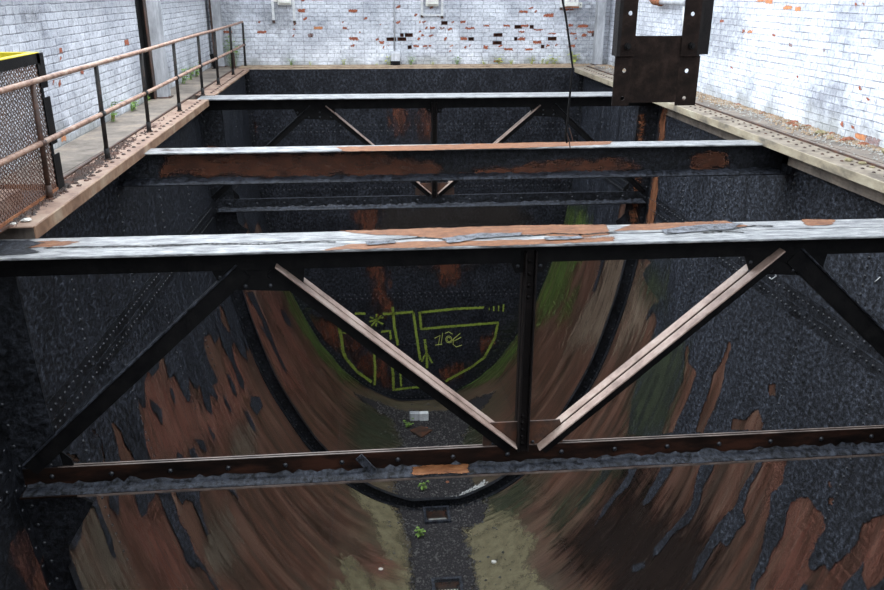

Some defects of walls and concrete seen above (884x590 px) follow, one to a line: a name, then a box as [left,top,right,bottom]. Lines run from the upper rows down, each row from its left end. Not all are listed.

rust [29,240,77,248]
peeling [0,176,216,255]
peeling [156,114,203,148]
rust [159,108,612,178]
rust [325,177,747,251]
rust [475,158,640,192]
rust [658,107,668,141]
peeling [658,107,726,141]
peeling [646,167,884,234]
peeling [641,257,742,341]
peeling [823,253,884,328]
rust [311,315,392,388]